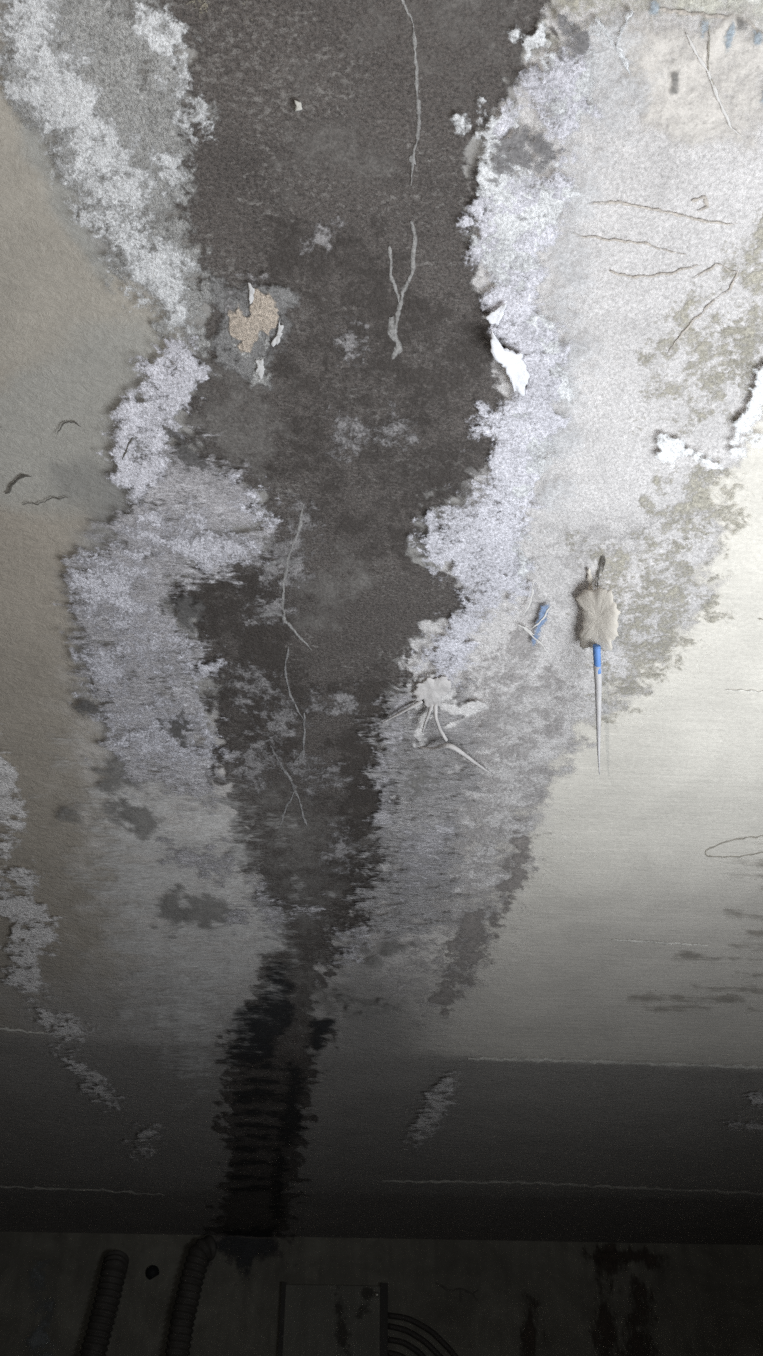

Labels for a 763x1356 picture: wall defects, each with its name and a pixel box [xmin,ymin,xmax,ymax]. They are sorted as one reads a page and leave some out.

crack [401,0,421,186]
spalling [210,273,300,390]
crack [387,221,417,359]
water stain [656,368,763,470]
crack [5,474,68,505]
peeling [341,0,763,1025]
water stain [0,0,649,1274]